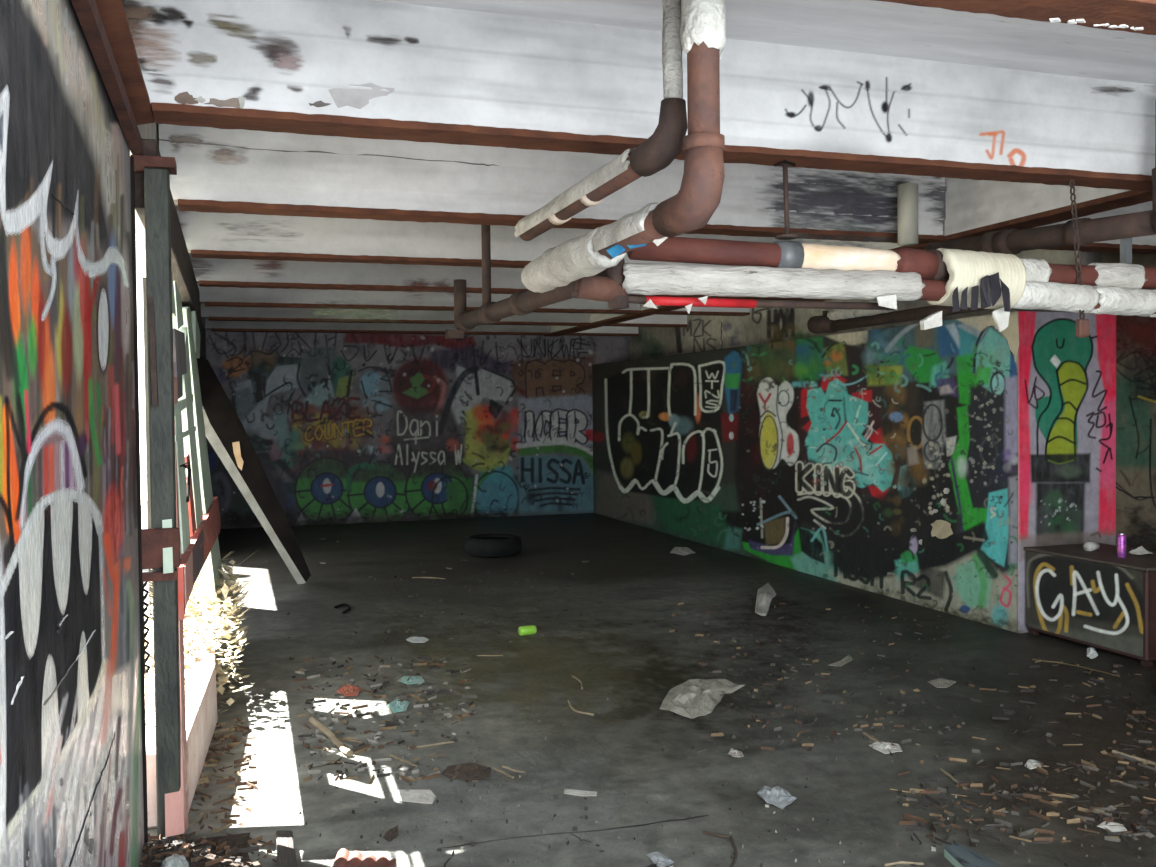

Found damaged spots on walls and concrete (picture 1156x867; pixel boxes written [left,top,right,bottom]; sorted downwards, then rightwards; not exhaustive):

peeling [1050,18,1144,30]
peeling [174,92,246,109]
spalling [309,83,394,109]